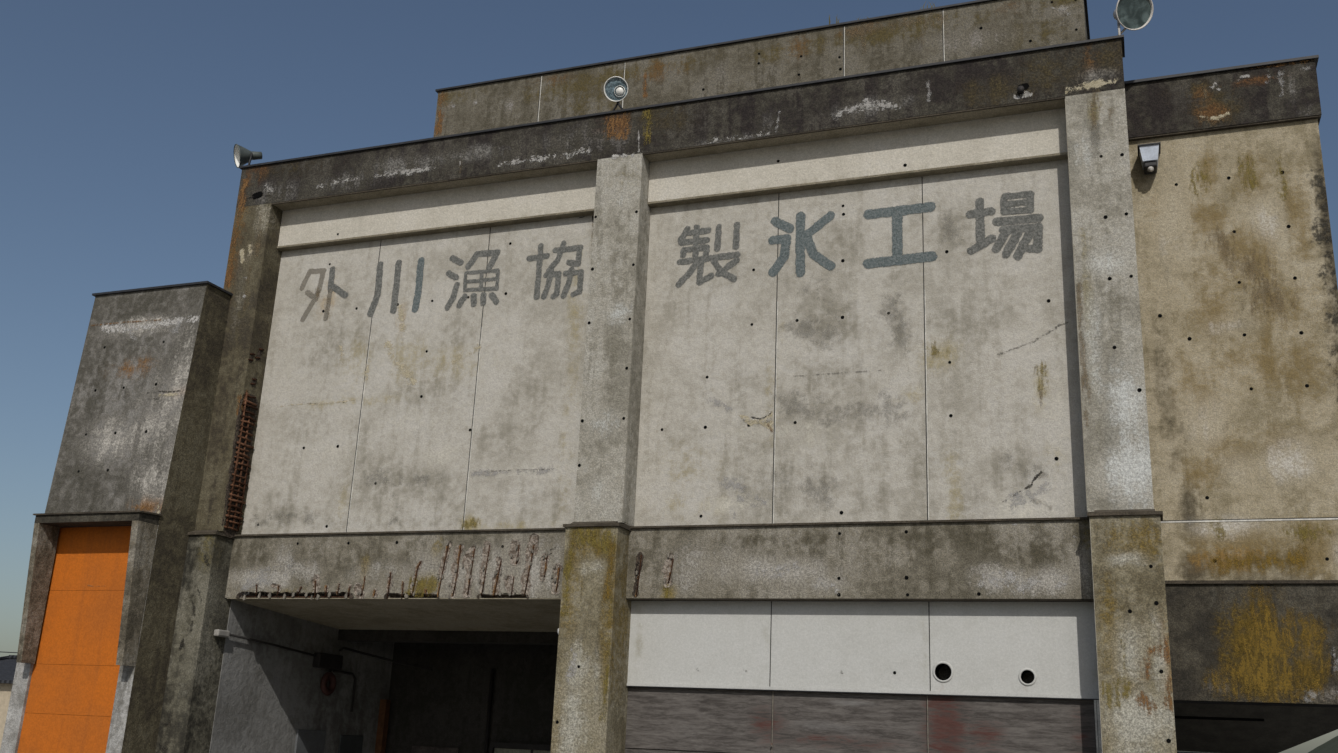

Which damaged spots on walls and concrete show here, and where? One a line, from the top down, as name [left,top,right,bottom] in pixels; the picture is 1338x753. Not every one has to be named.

corrosion [222,390,258,538]
crack [1012,471,1075,538]
spalling [236,533,562,601]
spalling [632,552,644,597]